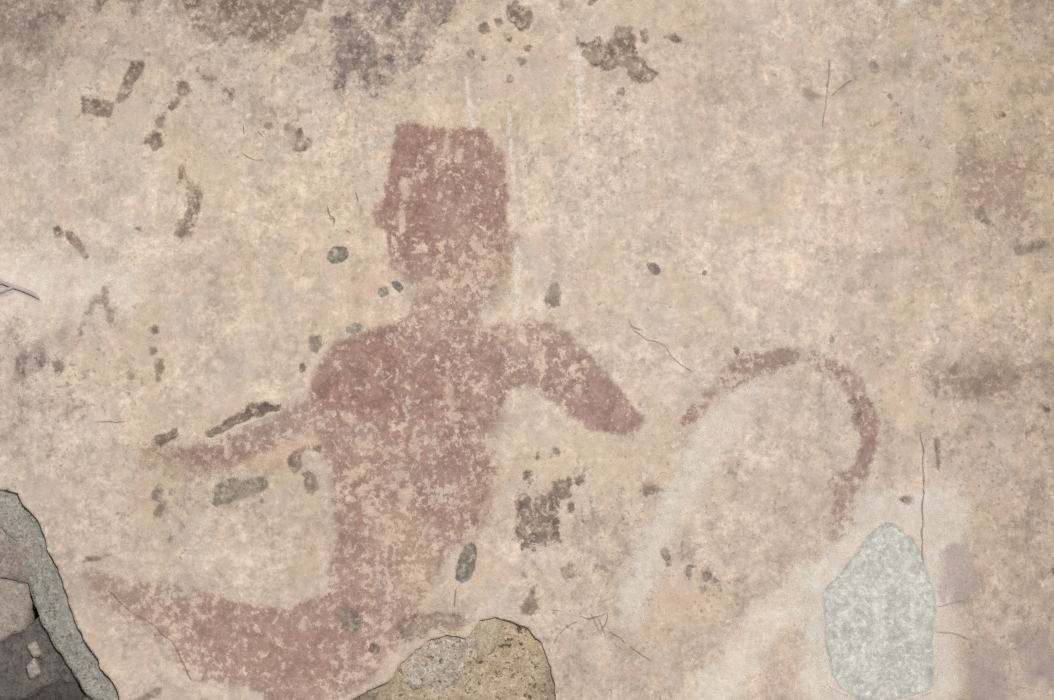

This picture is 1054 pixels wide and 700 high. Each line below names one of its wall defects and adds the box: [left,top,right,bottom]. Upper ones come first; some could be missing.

peeling [445,361,477,425]
spalling [214,478,267,505]
spalling [288,445,321,494]
crack [919,474,927,542]
spalling [455,543,476,582]
spalling [0,490,119,700]
spalling [353,588,556,700]